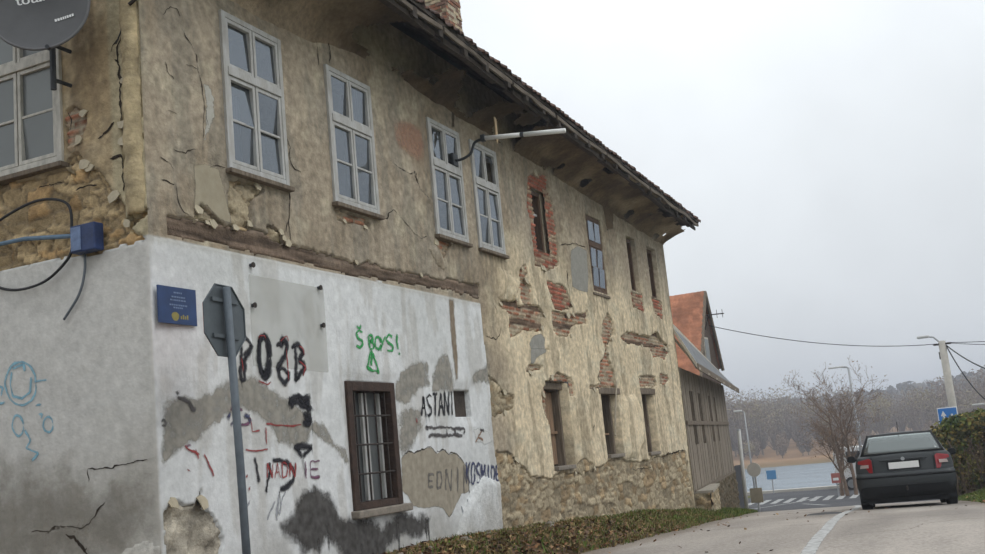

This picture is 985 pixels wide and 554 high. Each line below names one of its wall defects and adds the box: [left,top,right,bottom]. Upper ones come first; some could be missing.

crack [161,6,208,217]
flaking render [0,107,148,271]
peeling [194,164,262,232]
spalling [266,228,292,247]
spalling [499,169,586,337]
spalling [589,293,669,392]
crack [87,459,147,479]
crack [32,502,105,554]
spalling [163,491,220,554]